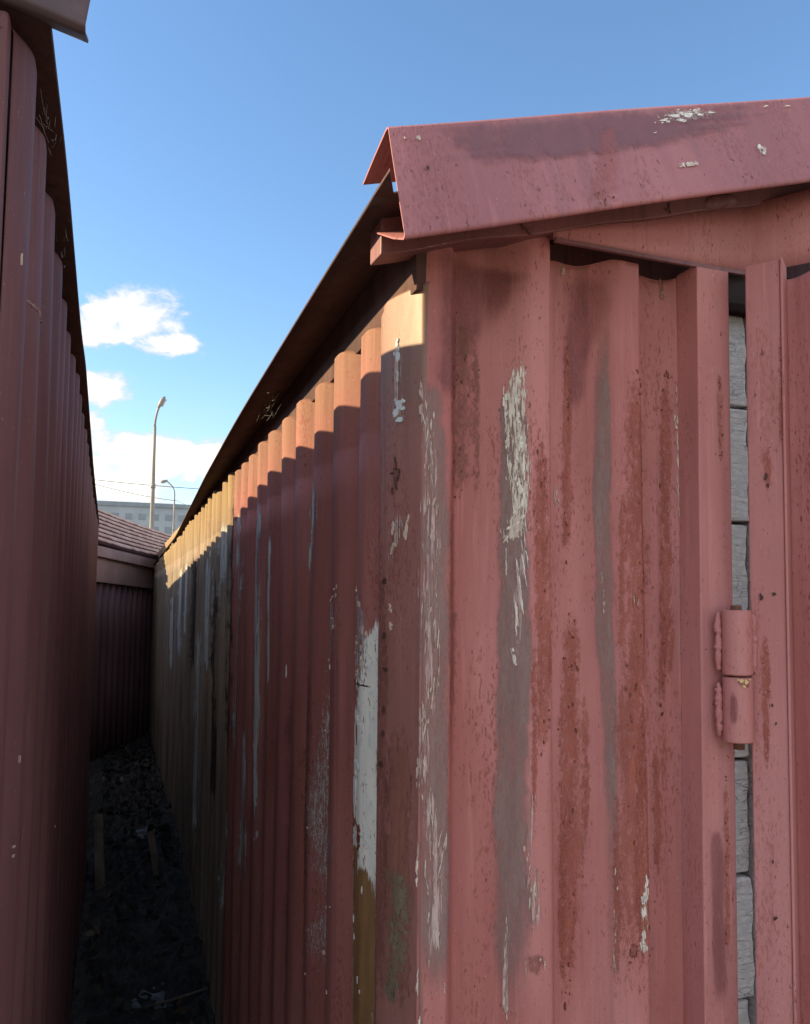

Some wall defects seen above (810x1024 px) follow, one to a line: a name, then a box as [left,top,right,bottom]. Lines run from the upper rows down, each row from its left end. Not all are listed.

leakage [459,109,741,157]
peeling [655,108,718,123]
corrosion [353,578,389,1024]
peeling [353,586,392,900]
peeling [393,338,405,423]
peeling [388,379,442,806]
corrosion [448,312,480,734]
peeling [500,361,532,549]
corrosion [531,443,590,1010]
corrosion [561,347,574,545]
corrosion [612,369,674,973]
peeling [639,874,649,953]